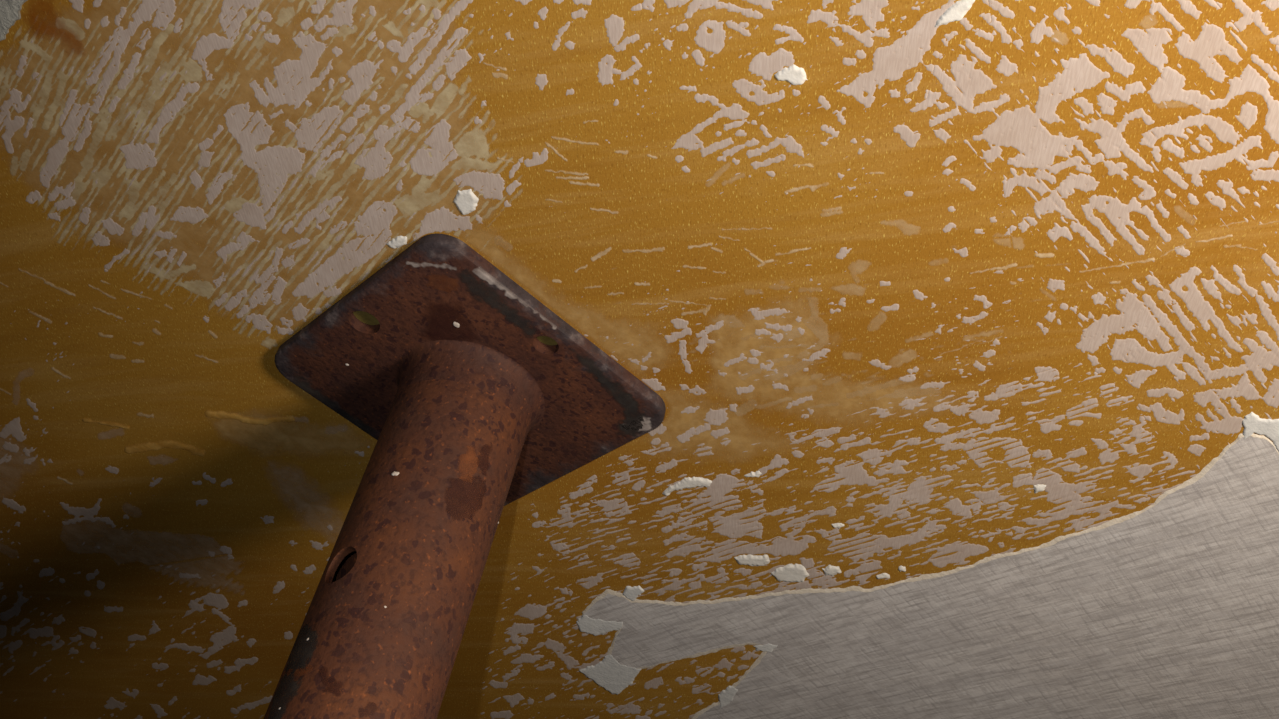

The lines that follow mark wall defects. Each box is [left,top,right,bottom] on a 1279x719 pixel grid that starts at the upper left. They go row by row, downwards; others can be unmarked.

peeling [0,40,43,154]
peeling [26,0,592,335]
rust [427,305,474,340]
peeling [481,0,1279,719]
peeling [0,398,54,466]
peeling [0,482,135,697]
peeling [119,565,273,718]
peeling [270,524,333,616]
peeling [98,688,209,719]